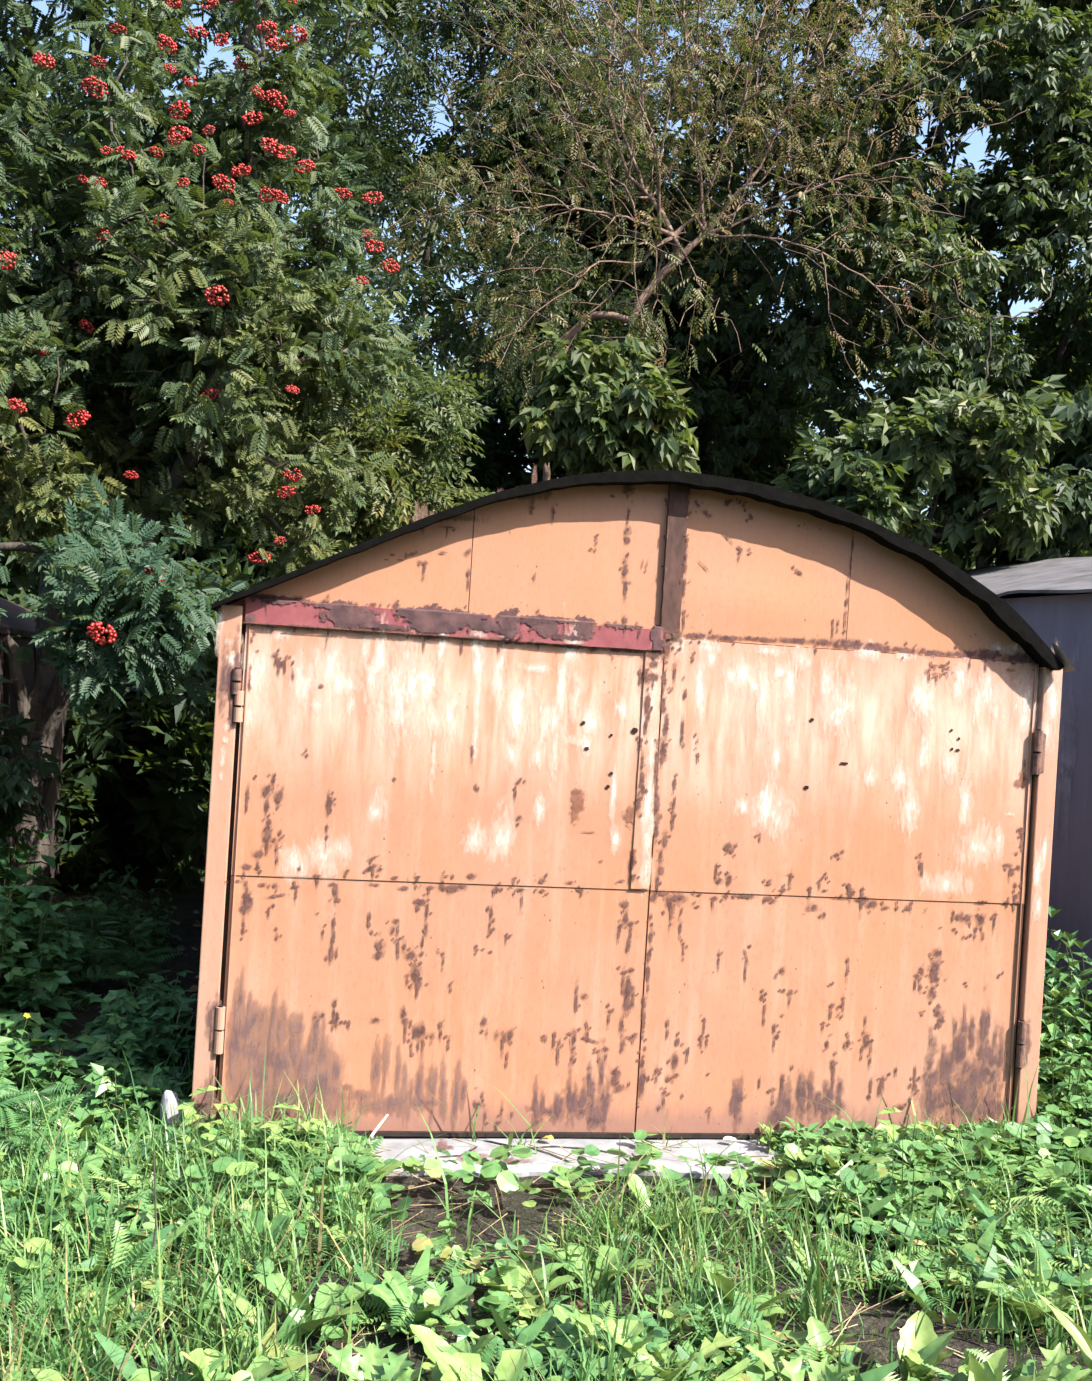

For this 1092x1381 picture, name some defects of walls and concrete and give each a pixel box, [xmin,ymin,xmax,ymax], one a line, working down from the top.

corrosion [414,503,476,530]
corrosion [518,468,551,510]
corrosion [612,485,633,598]
corrosion [195,529,1038,1139]